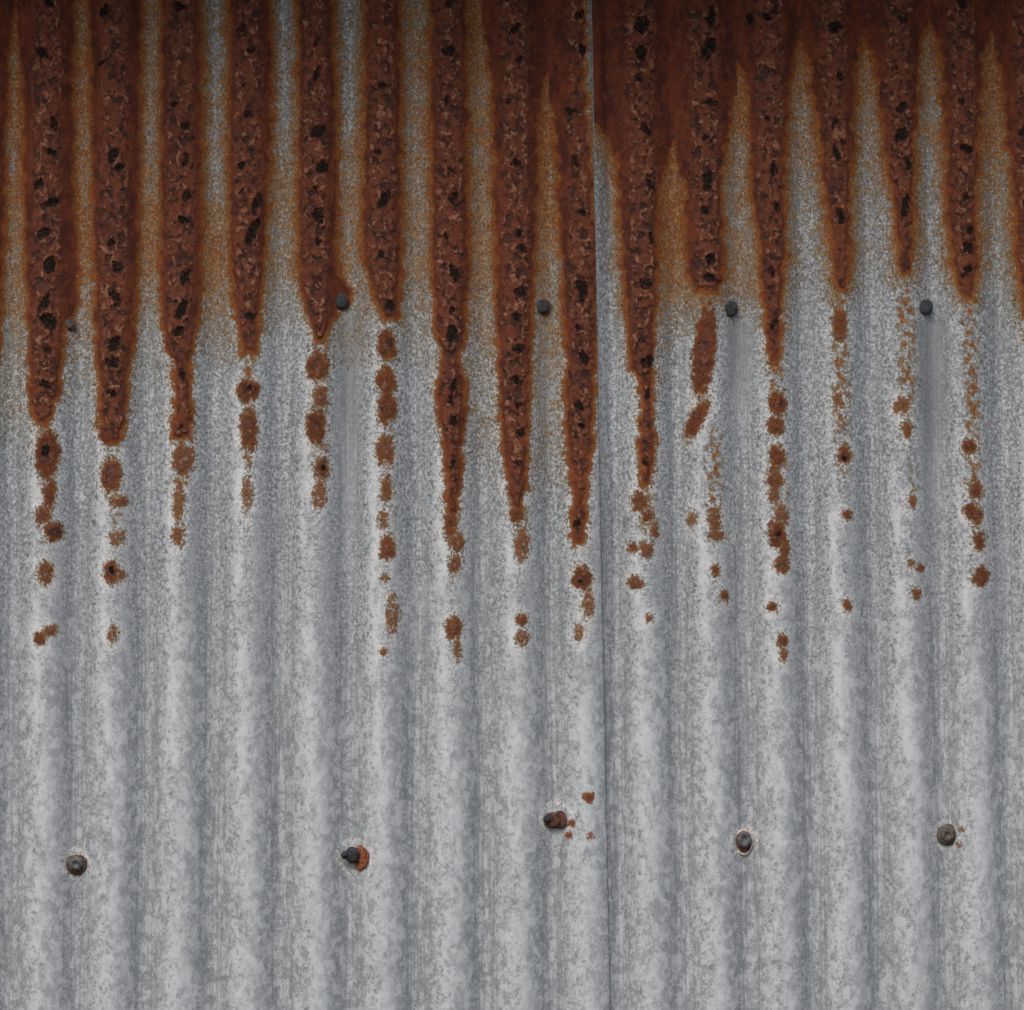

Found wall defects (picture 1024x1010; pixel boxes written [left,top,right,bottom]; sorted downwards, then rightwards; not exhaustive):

rust [0,0,1024,641]
rust [34,623,60,648]
rust [107,624,120,645]
rust [442,612,465,663]
rust [514,610,531,647]
rust [776,632,790,664]
rust [582,792,595,804]